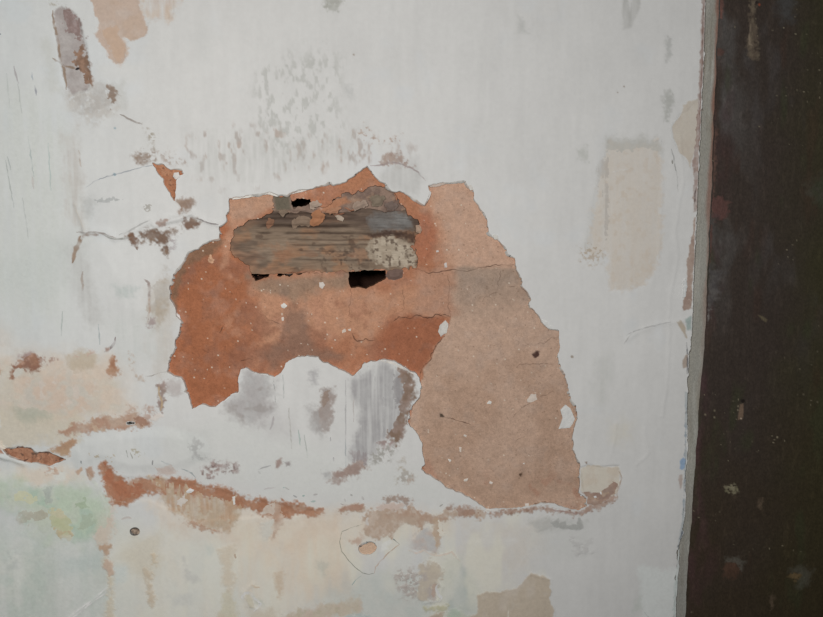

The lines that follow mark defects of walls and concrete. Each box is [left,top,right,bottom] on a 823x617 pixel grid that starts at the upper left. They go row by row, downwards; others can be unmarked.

flaking render [89,0,185,70]
flaking render [0,167,623,561]
leakage [213,540,377,617]